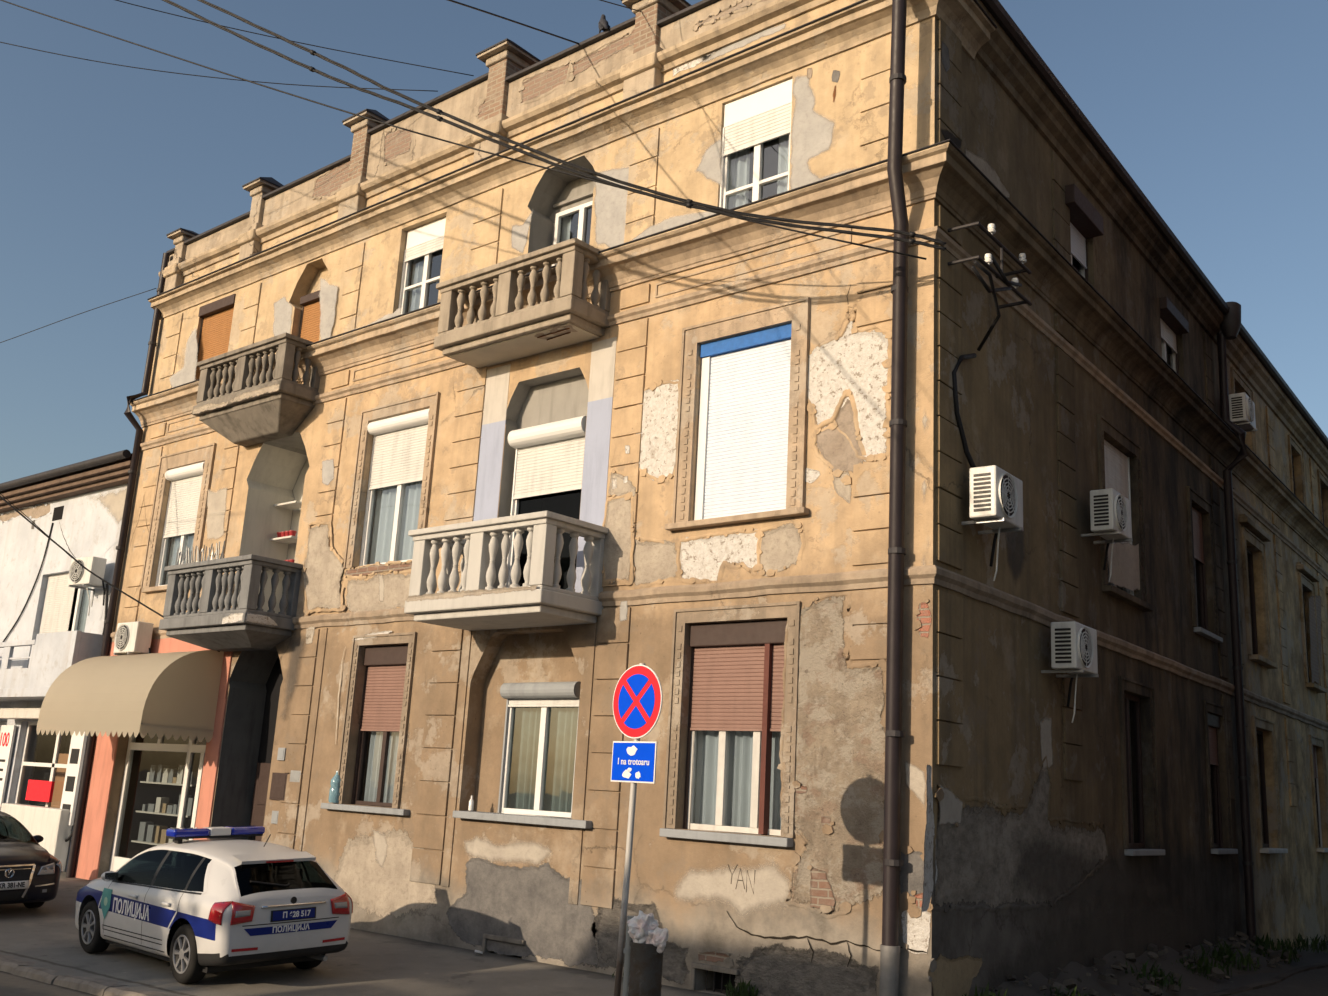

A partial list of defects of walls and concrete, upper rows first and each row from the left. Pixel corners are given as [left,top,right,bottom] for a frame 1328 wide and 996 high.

peeling [602,379,805,621]
peeling [805,304,892,503]
peeling [334,828,436,919]
crack [727,912,927,967]
spalling [777,592,887,919]
peeling [900,756,1109,996]